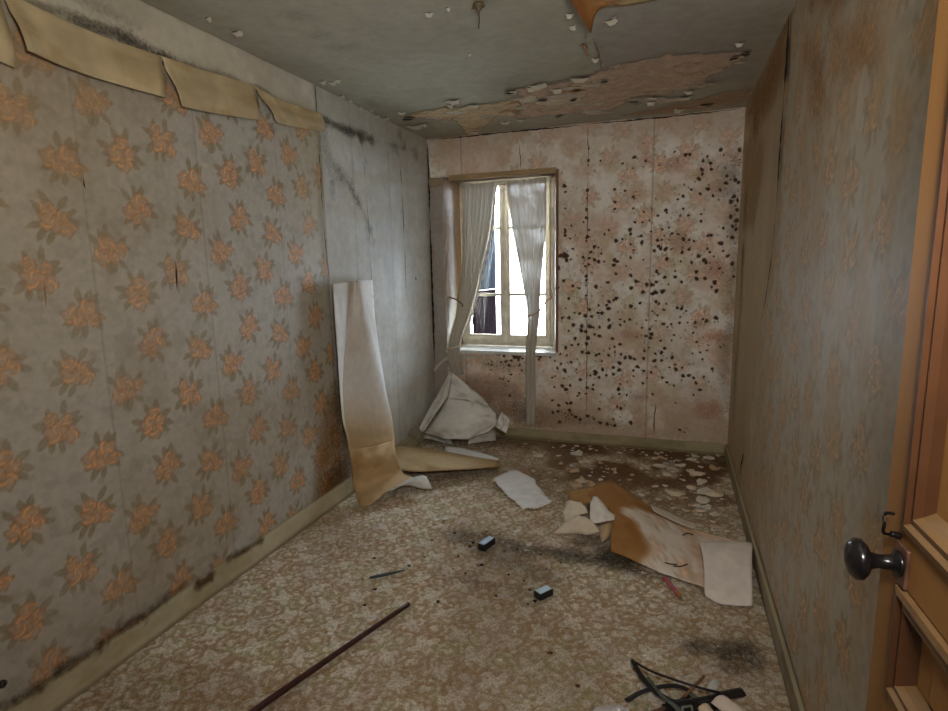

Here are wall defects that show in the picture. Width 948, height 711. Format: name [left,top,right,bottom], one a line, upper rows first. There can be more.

peeling [319,38,751,135]
damp [536,144,740,427]
damp [195,572,213,589]
damp [54,586,182,675]